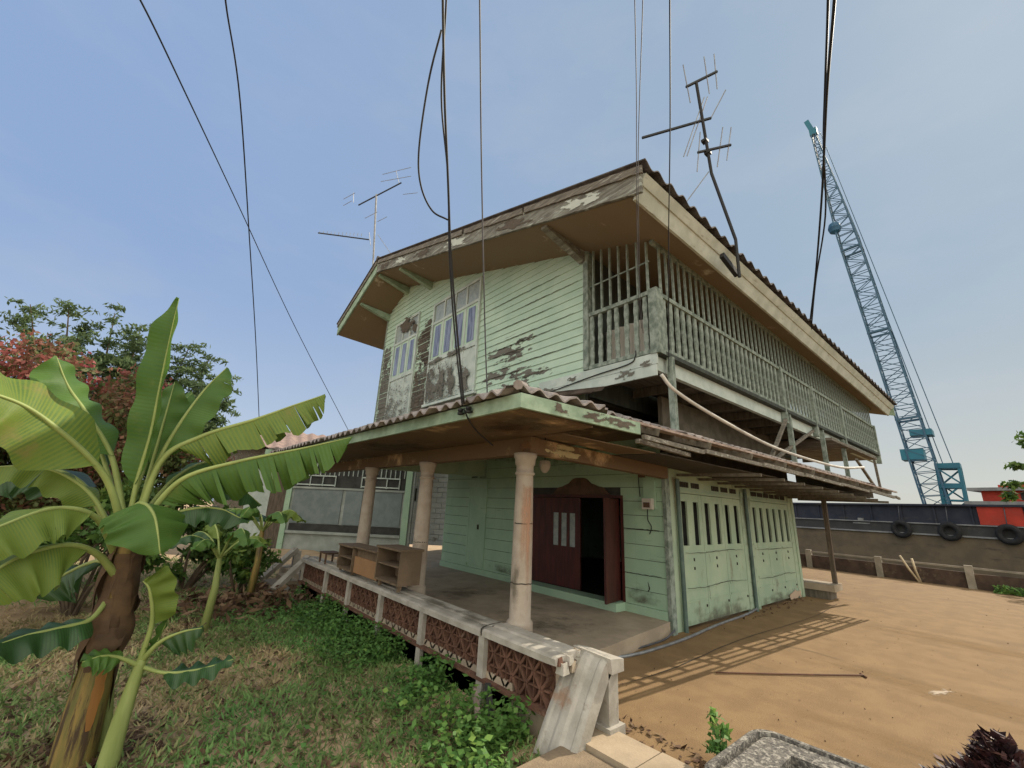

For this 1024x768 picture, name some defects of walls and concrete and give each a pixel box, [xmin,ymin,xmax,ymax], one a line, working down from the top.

peeling [560,192,600,211]
peeling [376,315,551,422]
peeling [582,412,636,428]